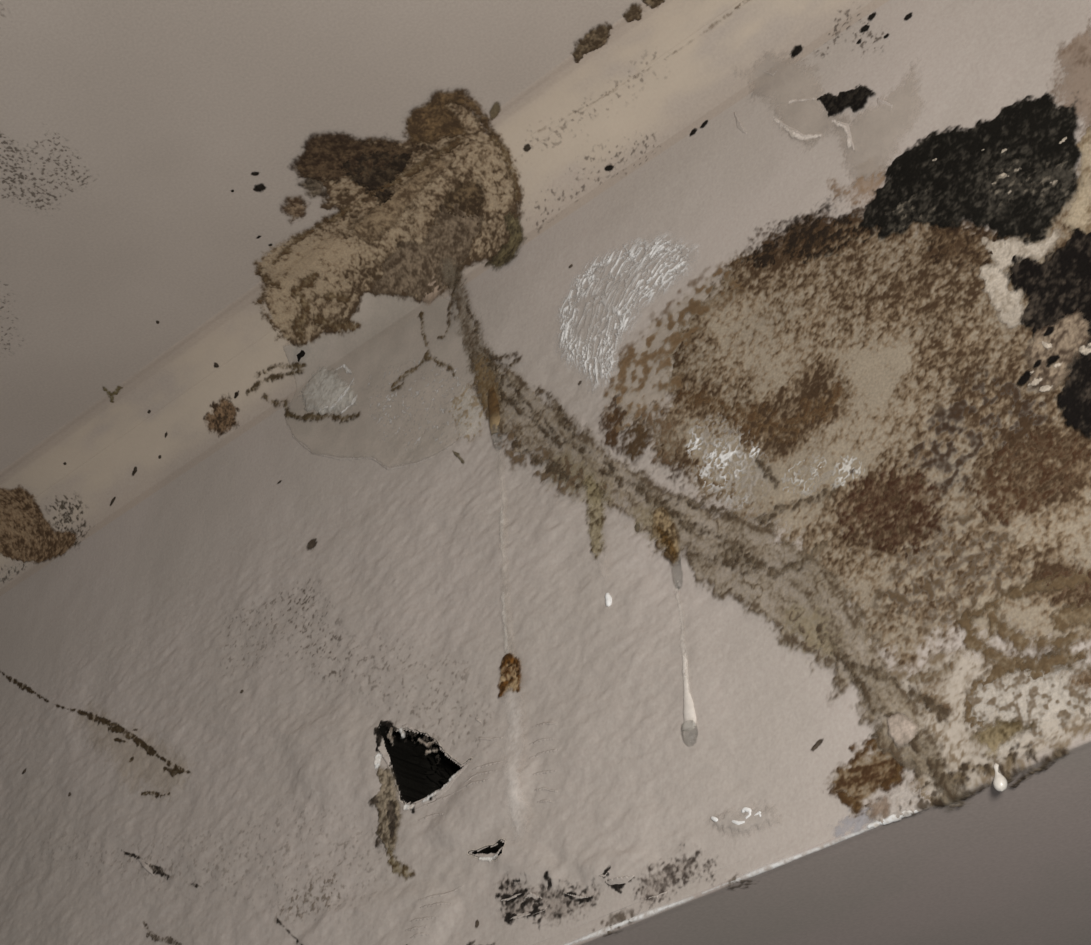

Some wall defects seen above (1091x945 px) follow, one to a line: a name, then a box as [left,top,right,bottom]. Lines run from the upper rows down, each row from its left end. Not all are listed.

peeling [753,54,922,179]
leakage [203,29,1091,808]
spalling [50,496,86,546]
corrosion [498,653,521,697]
crack [2,672,190,798]
leakage [507,690,525,835]
crack [144,923,181,945]
peeling [496,851,713,924]
peeling [601,911,634,936]